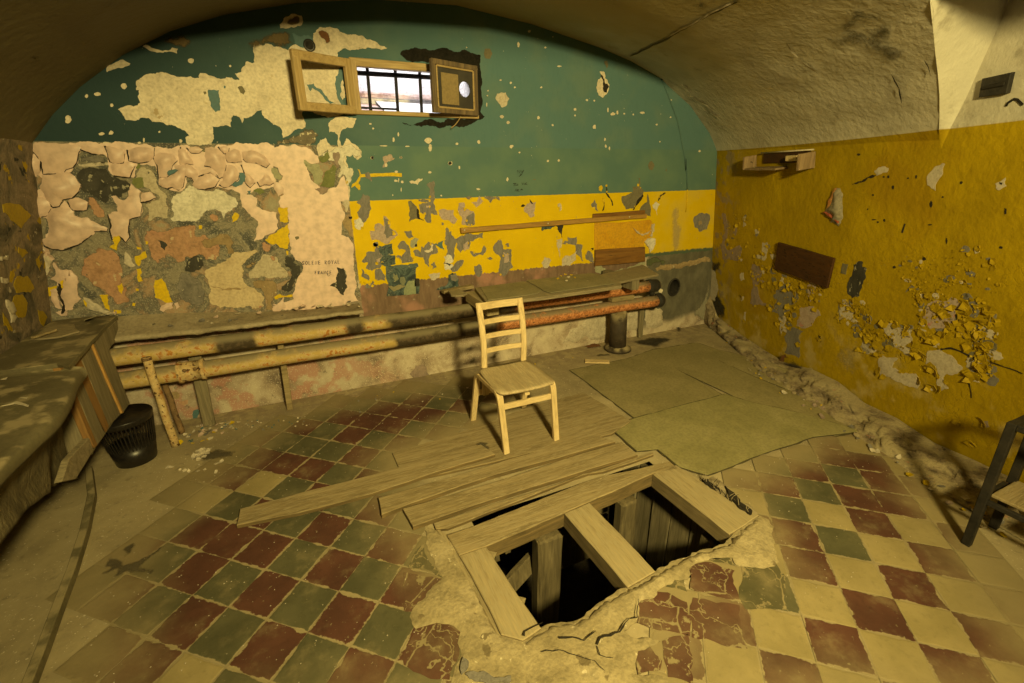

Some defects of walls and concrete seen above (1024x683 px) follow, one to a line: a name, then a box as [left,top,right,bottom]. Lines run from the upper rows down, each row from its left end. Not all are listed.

peeling [0,14,516,330]
peeling [521,200,536,217]
peeling [907,163,945,207]
spalling [542,178,1024,541]
spalling [472,485,576,526]
spalling [494,471,758,646]
crack [522,601,639,671]